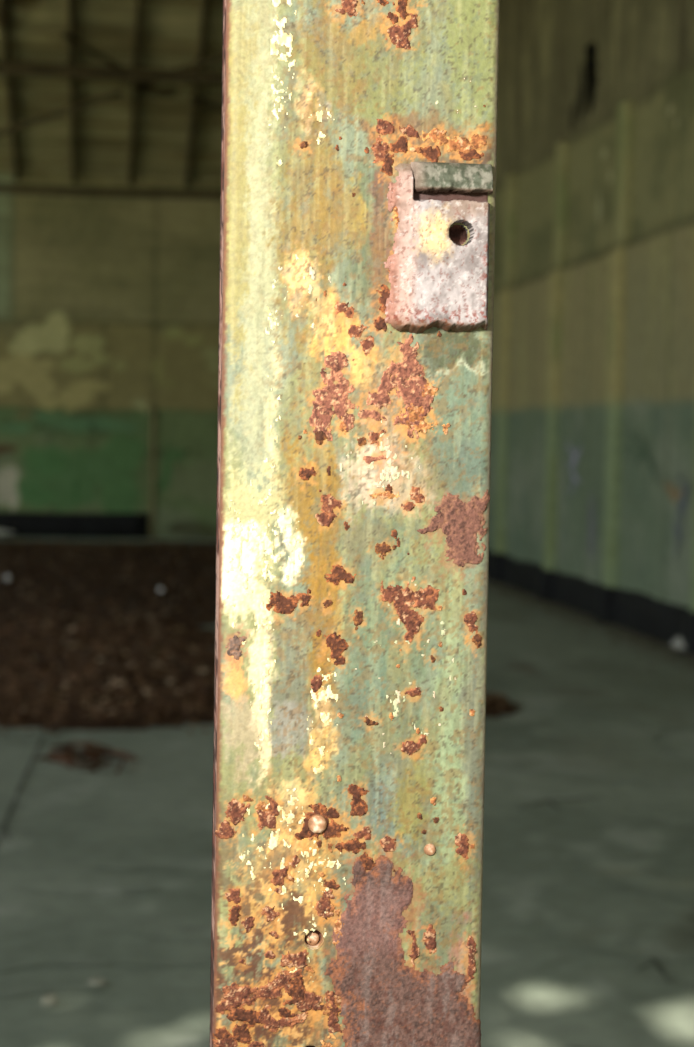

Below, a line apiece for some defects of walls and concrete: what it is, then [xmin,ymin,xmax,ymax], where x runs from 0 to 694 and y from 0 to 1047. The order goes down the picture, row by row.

rust [378,0,418,49]
rust [364,119,487,176]
peeling [265,306,282,346]
rust [298,262,450,464]
rust [369,484,490,567]
peeling [225,487,301,643]
rust [266,589,312,614]
rust [316,629,349,666]
rust [324,565,356,585]
rust [380,577,442,651]
peeling [250,659,276,763]
rust [212,775,481,1047]